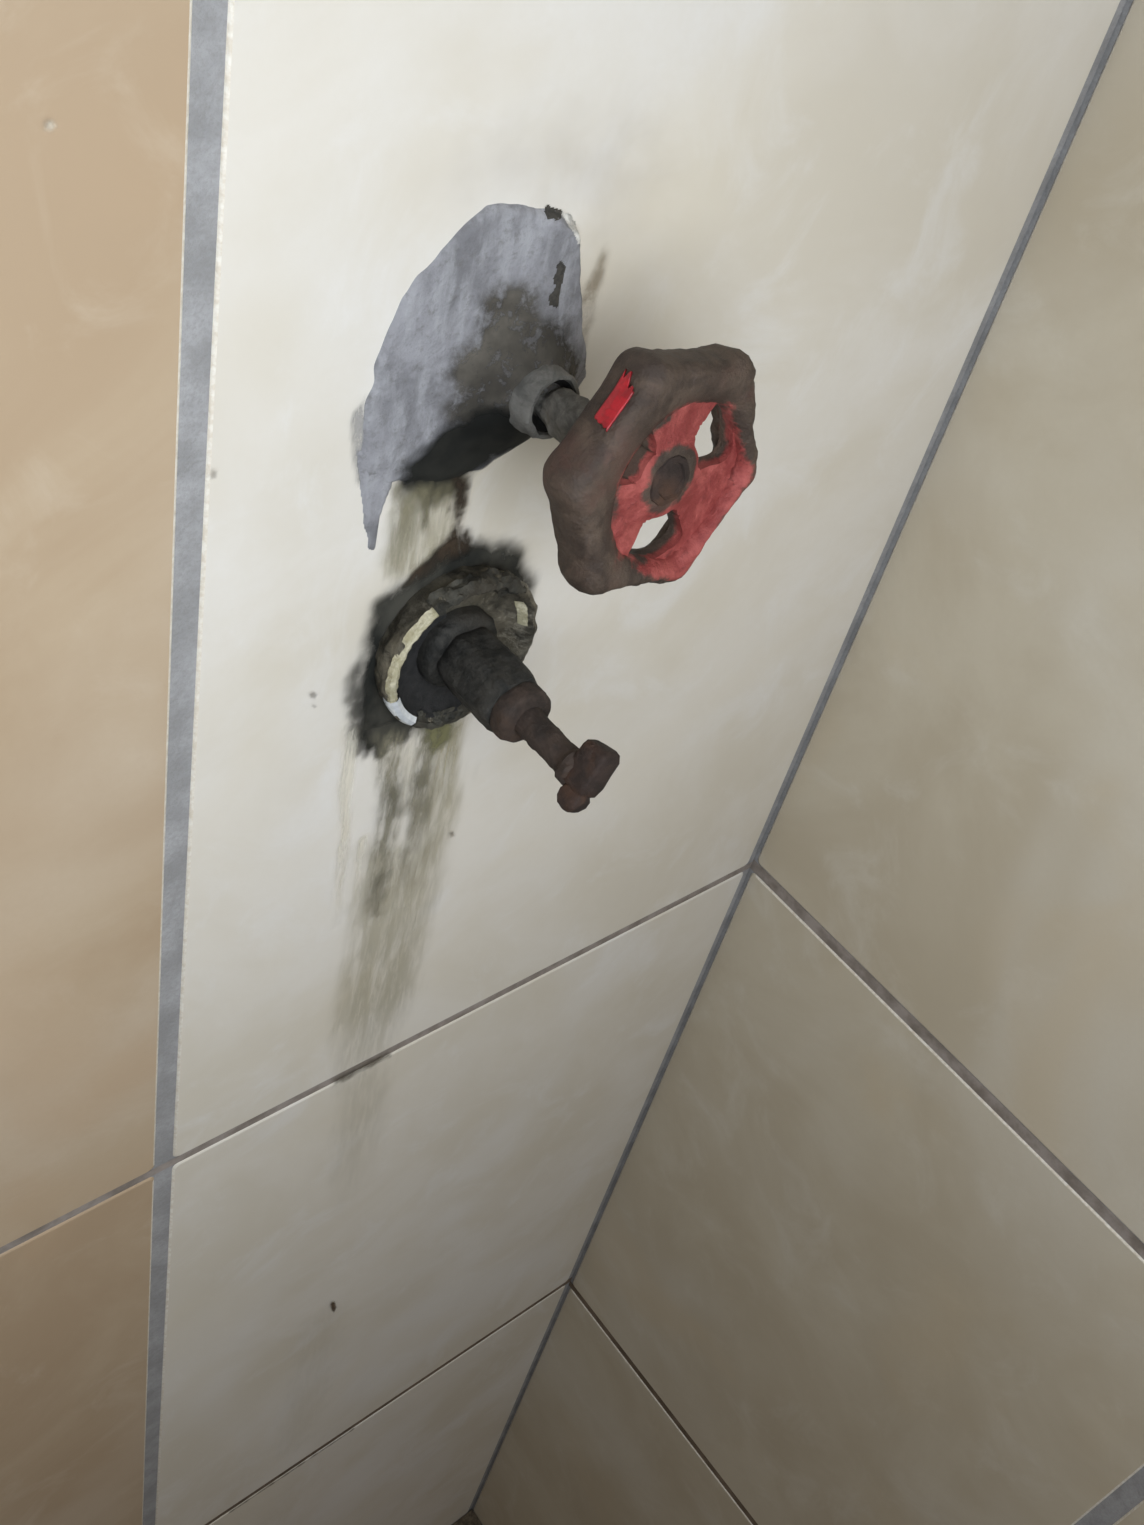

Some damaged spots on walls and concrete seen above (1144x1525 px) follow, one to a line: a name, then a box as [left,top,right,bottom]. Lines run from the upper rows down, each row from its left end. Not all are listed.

spalling [561,210,581,246]
leakage [342,544,533,855]